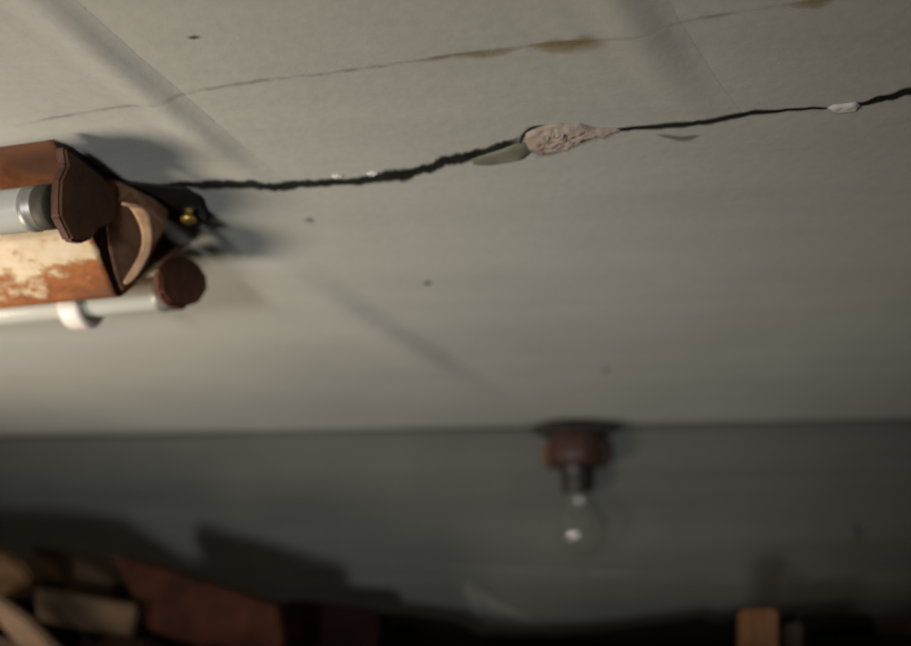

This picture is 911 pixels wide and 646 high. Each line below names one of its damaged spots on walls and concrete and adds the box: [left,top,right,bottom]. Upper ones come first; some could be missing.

crack [618,88,911,140]
crack [161,140,531,191]